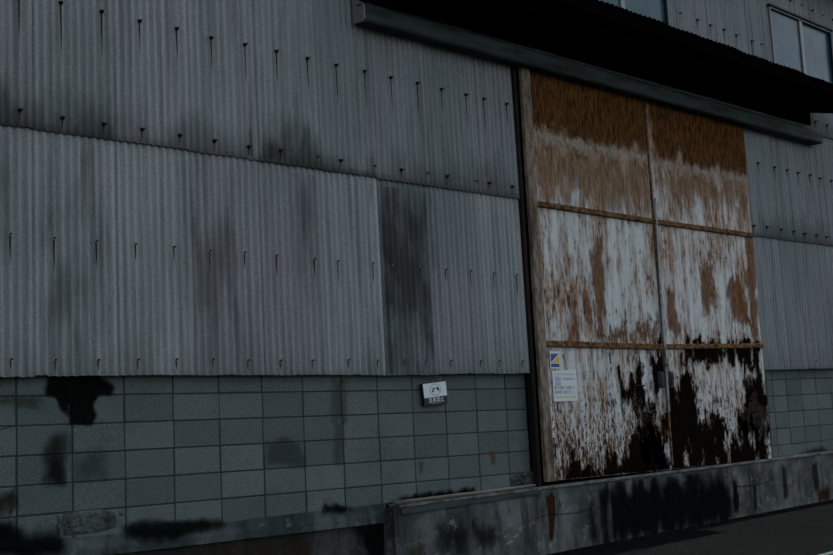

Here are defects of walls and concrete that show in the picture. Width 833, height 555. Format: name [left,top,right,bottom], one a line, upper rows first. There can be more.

corrosion [530,70,747,178]
water stain [382,193,429,314]
water stain [46,375,114,425]
water stain [0,523,64,555]
spalling [58,509,124,537]
corrosion [547,492,556,541]
water stain [591,473,739,543]